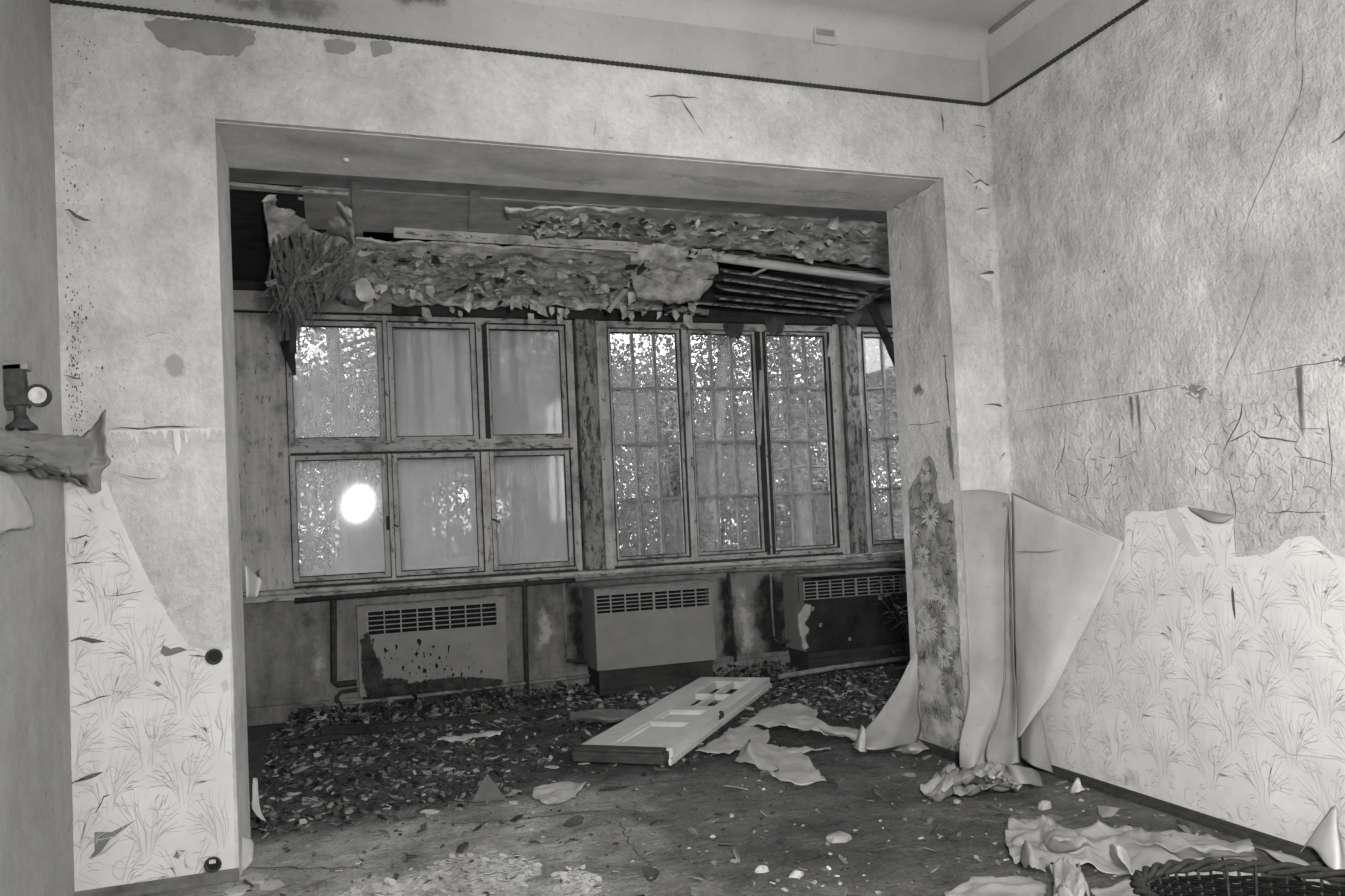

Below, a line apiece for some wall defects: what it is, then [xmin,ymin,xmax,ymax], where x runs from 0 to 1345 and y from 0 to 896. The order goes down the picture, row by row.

peeling [145,17,256,57]
peeling [324,38,392,57]
crack [620,86,704,134]
crack [1215,0,1304,240]
peeling [357,213,889,316]
crack [1187,258,1333,556]
crack [1052,414,1156,528]